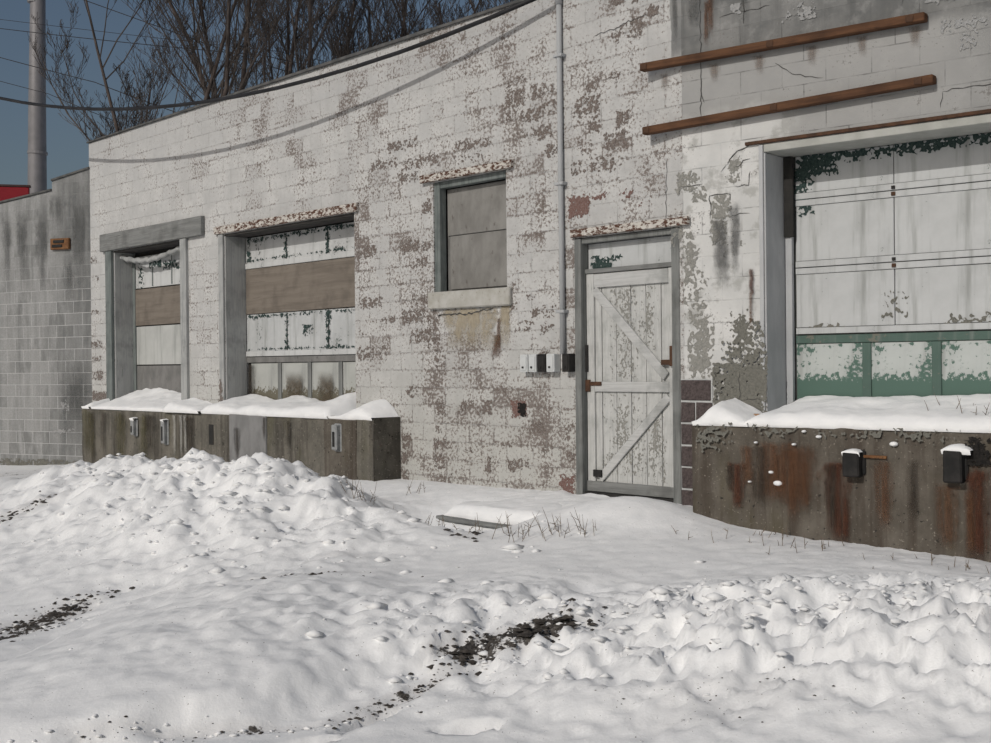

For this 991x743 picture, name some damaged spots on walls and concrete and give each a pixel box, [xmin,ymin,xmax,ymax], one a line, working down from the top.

peeling [504,74,558,158]
peeling [571,71,629,176]
peeling [371,137,439,195]
peeling [567,188,642,226]
peeling [590,254,623,269]
peeling [670,156,768,413]
water stain [716,210,739,268]
peeling [794,132,991,217]
peeling [247,293,447,375]
peeling [433,384,507,483]
corrosion [728,444,807,508]
corrosion [824,463,848,536]